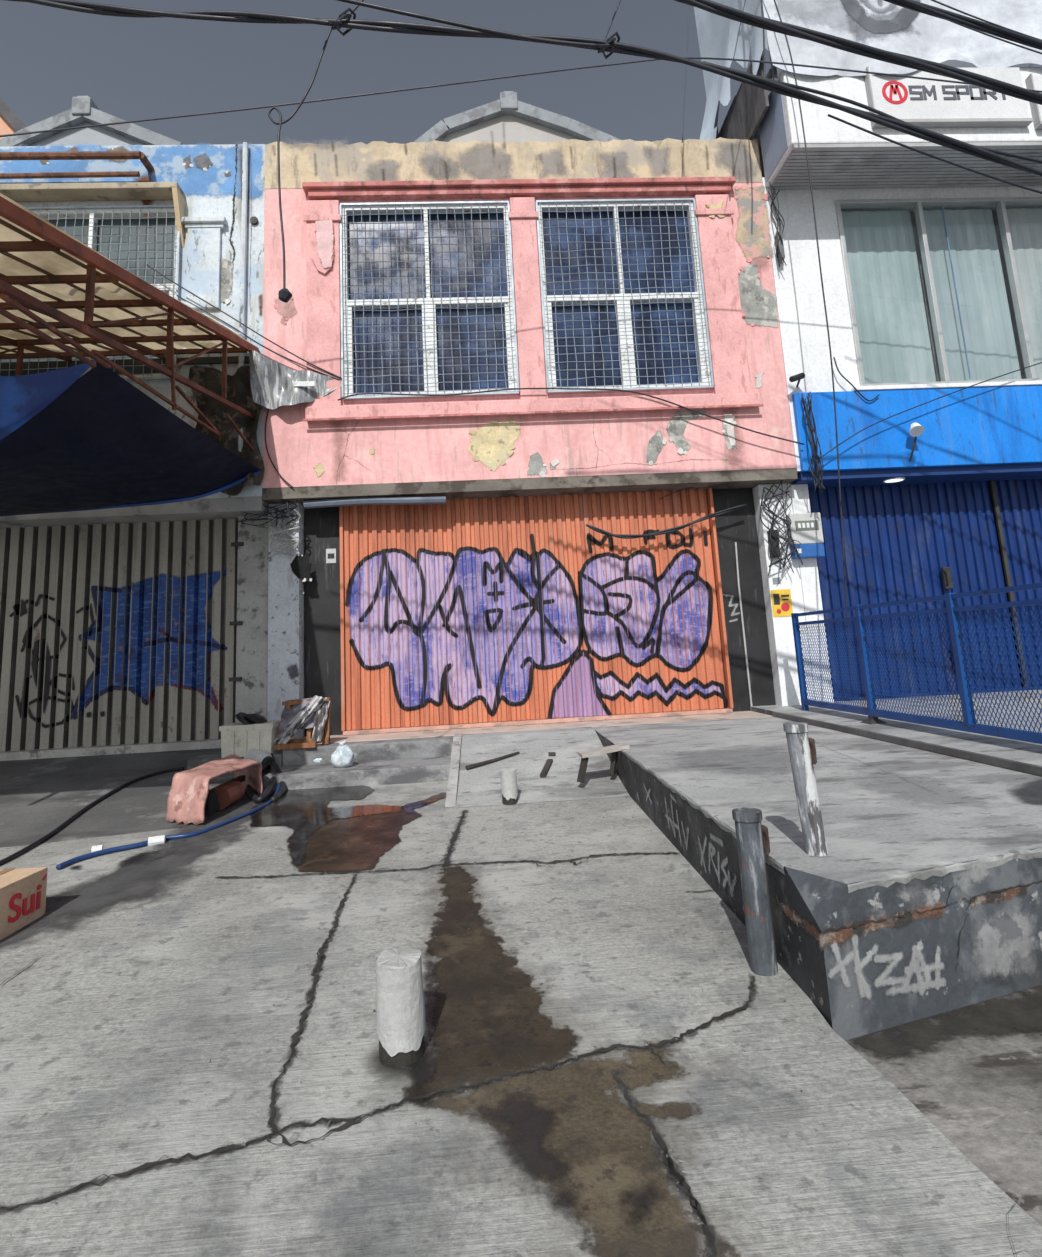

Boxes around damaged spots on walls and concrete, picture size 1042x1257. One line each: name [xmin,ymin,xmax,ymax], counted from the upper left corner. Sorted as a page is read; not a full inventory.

peeling [182,153,231,176]
leakage [423,145,510,180]
leakage [539,151,564,177]
leakage [601,153,631,178]
leakage [645,147,668,174]
peeling [706,185,778,328]
peeling [468,419,520,471]
peeling [646,409,707,465]
peeling [722,414,737,450]
peeling [528,452,560,478]
crack [0,809,757,1257]
leakage [372,866,740,1257]